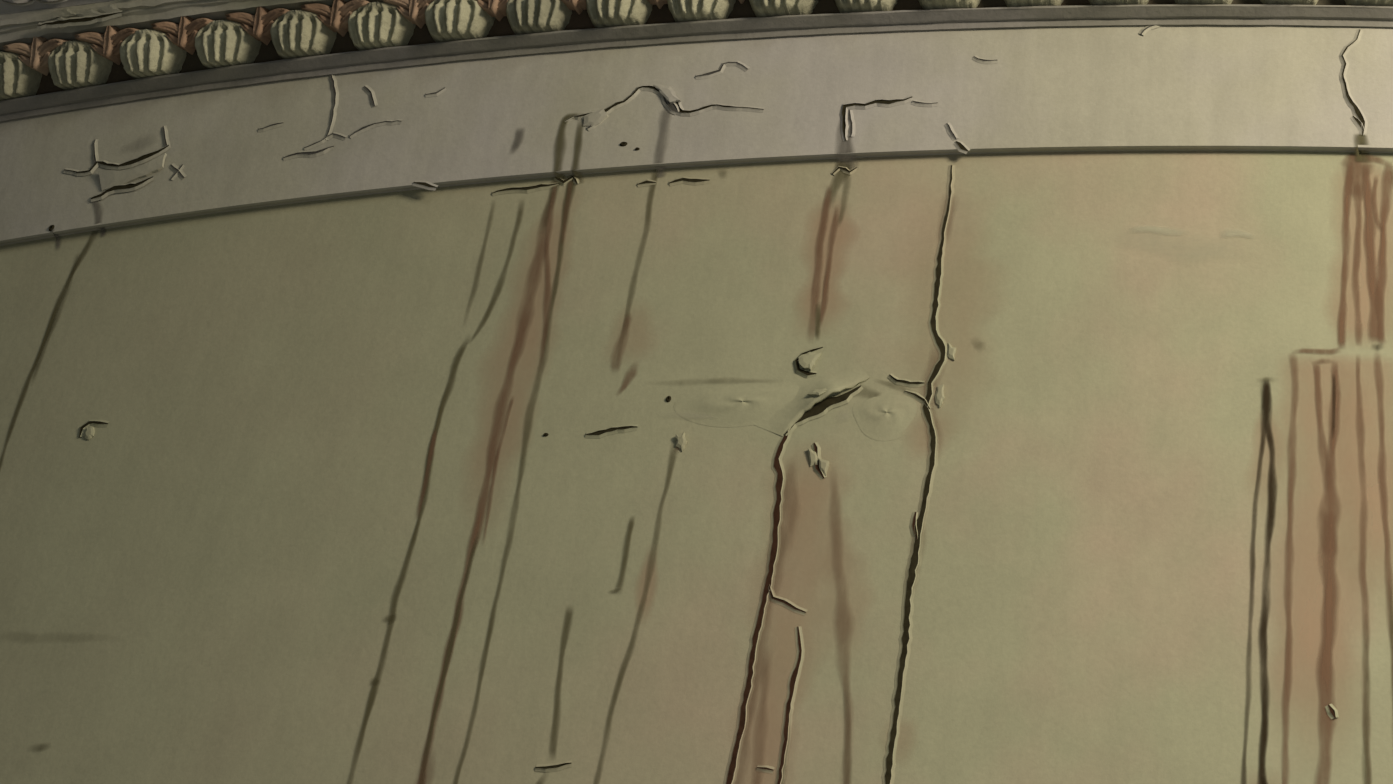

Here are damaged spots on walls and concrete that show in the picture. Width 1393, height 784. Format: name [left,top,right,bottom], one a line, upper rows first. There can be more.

crack [564,61,764,131]
crack [1339,29,1368,161]
crack [412,180,439,191]
crack [492,182,559,196]
crack [637,177,710,187]
rust [813,193,839,335]
flaking render [754,346,870,436]
flaking render [808,442,829,480]
crack [839,95,970,784]
rust [1284,155,1392,784]
rust [420,312,529,784]